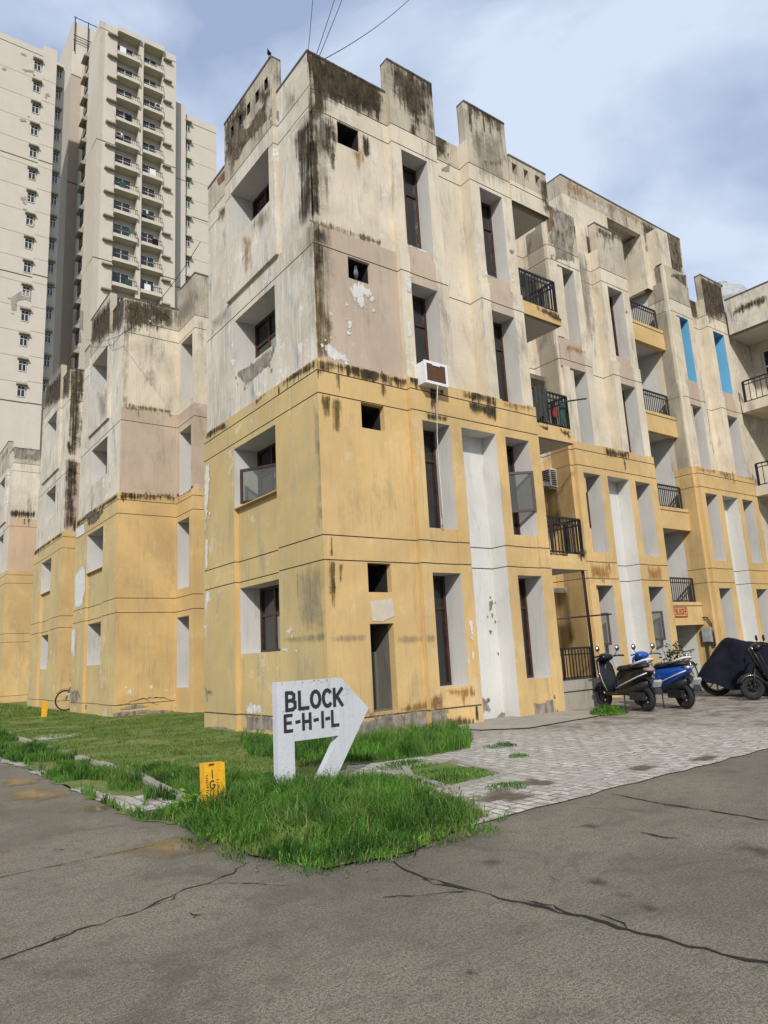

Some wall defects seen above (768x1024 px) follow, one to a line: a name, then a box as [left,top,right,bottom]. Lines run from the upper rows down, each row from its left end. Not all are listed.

water stain [393,66,432,134]
water stain [295,50,381,309]
water stain [541,181,573,241]
peeling [346,282,375,335]
water stain [690,275,766,322]
peeling [321,337,349,365]
water stain [278,360,418,431]
water stain [464,392,496,420]
water stain [35,367,193,557]
crack [616,794,765,820]
crack [0,864,290,960]
crack [385,857,768,963]